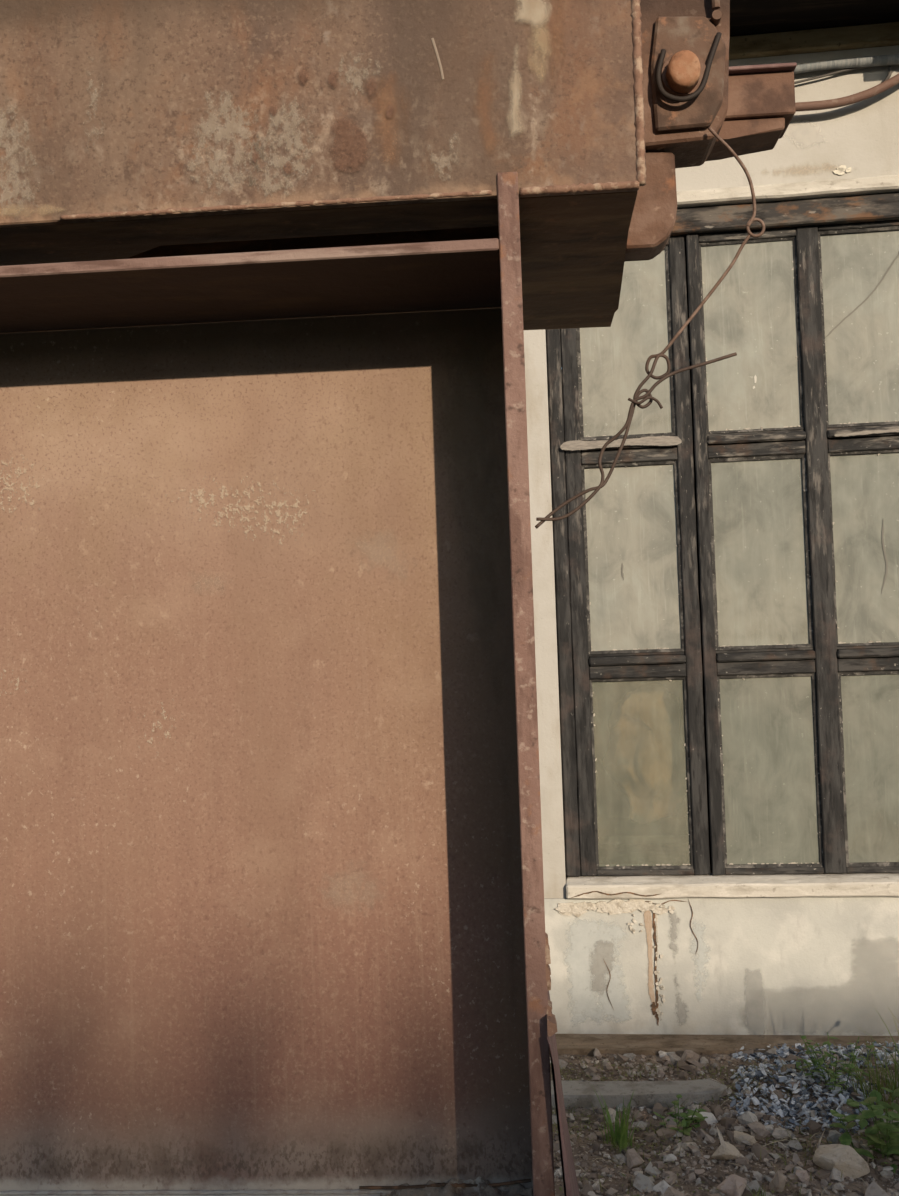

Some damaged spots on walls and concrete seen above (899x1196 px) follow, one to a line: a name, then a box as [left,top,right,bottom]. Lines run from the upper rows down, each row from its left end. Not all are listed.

peeling [517,0,548,77]
peeling [188,92,312,195]
peeling [511,73,520,132]
peeling [545,891,686,1037]